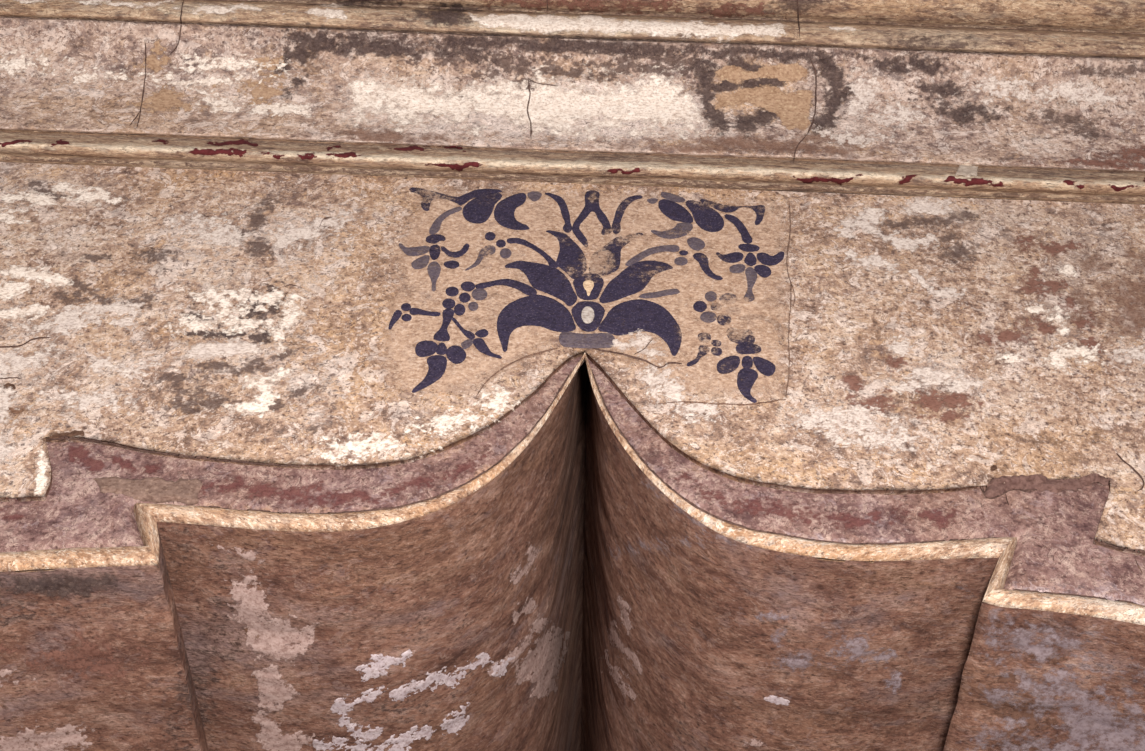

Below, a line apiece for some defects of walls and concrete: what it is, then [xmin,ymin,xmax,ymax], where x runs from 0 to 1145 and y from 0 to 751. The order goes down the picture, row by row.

crack [130,0,184,126]
crack [793,0,820,161]
leakage [653,52,857,155]
peeling [0,139,69,147]
peeling [152,139,361,160]
peeling [793,174,862,185]
crack [1116,453,1145,491]
crack [1096,538,1145,572]
crack [1012,588,1140,605]
peeling [217,542,570,751]
peeling [0,717,95,751]